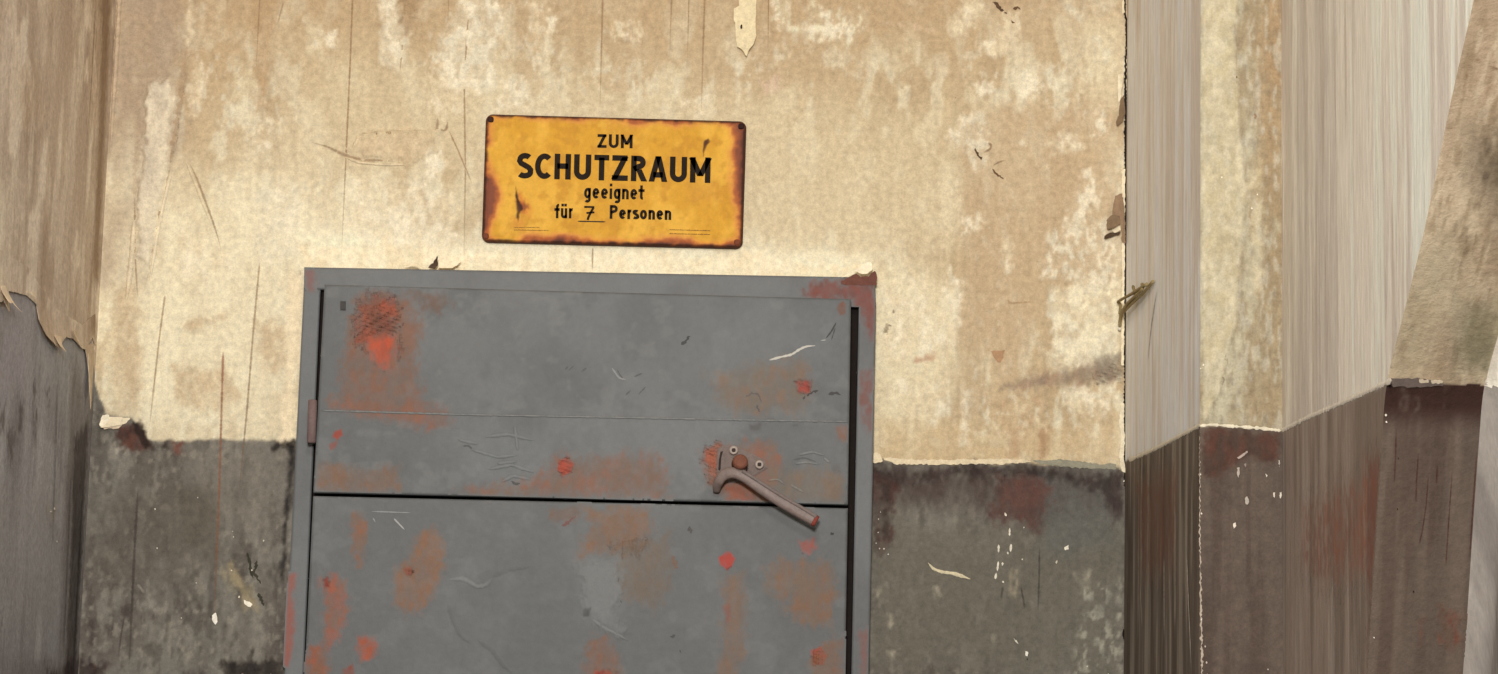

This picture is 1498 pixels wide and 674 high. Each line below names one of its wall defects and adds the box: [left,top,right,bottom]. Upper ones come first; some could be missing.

water stain [341,0,354,260]
peeling [0,250,130,429]
water stain [91,0,285,632]
peeling [275,0,1455,674]
water stain [276,440,296,590]